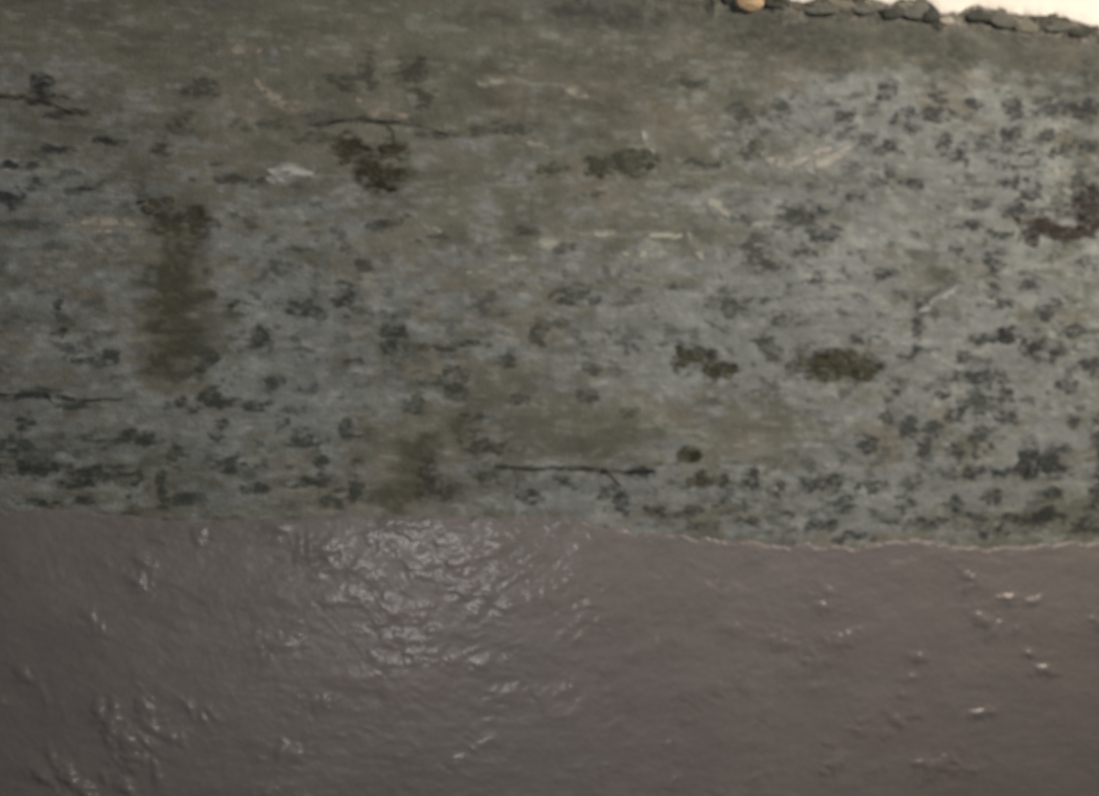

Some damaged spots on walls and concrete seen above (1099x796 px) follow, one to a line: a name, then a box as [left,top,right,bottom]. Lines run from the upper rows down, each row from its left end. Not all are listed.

flaking render [634,0,1099,51]
spalling [308,114,406,191]
spalling [585,149,657,178]
peeling [993,99,1070,160]
spalling [958,165,1099,247]
leakage [143,221,216,379]
spalling [675,345,738,379]
spalling [752,336,884,382]
peeling [0,417,142,504]
crack [512,467,655,489]
spalling [678,445,730,487]
peeling [882,326,1099,538]